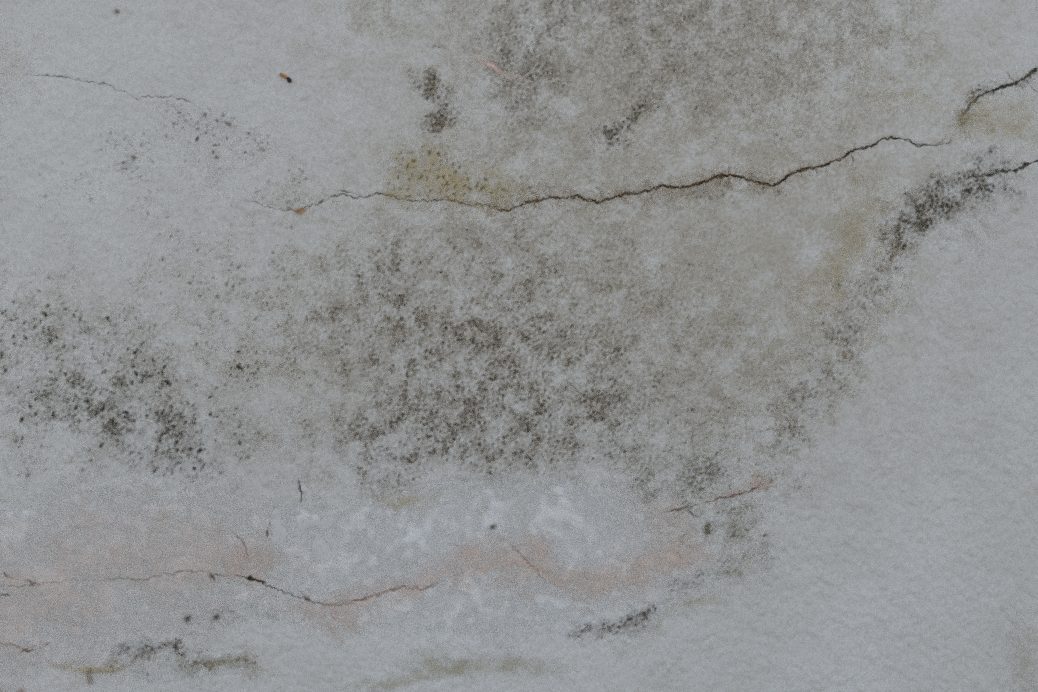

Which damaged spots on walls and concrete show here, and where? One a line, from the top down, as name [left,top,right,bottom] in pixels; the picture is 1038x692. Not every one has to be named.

damp [425,73,436,99]
damp [429,104,452,132]
crack [961,68,1038,120]
crack [274,136,932,213]
crack [972,160,1038,178]
damp [883,170,998,248]
damp [65,373,202,470]
crack [246,576,308,599]